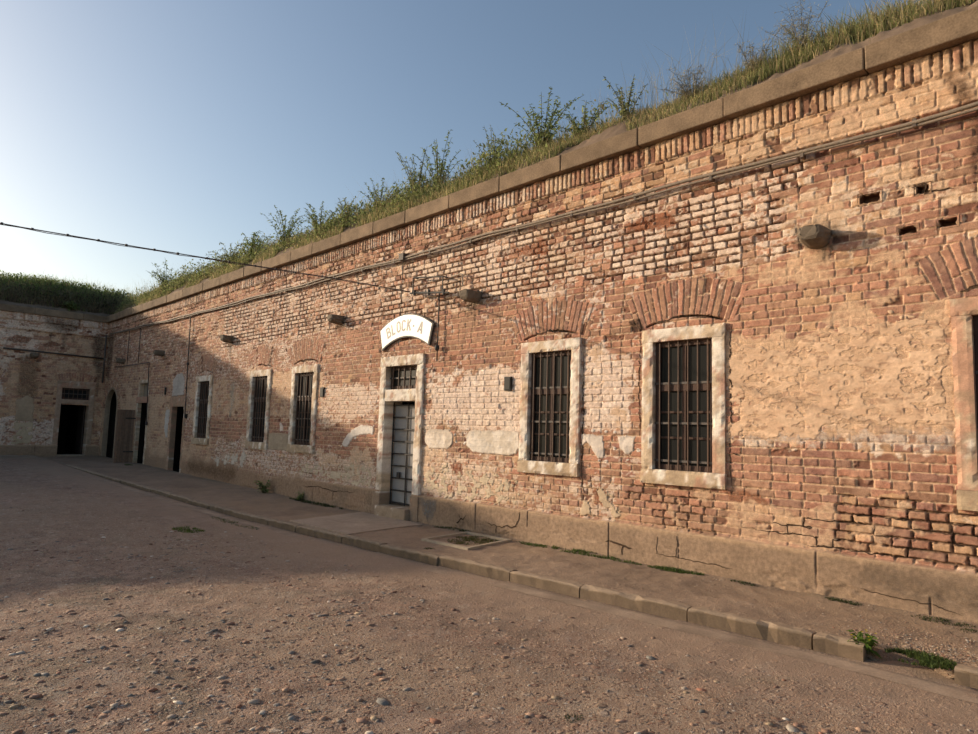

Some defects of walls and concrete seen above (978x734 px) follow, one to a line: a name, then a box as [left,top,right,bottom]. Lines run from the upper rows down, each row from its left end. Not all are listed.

flaking render [422,463,520,506]
spalling [723,490,767,504]
crack [605,540,632,555]
crack [656,536,729,569]
crack [745,509,978,558]
crack [861,588,962,616]